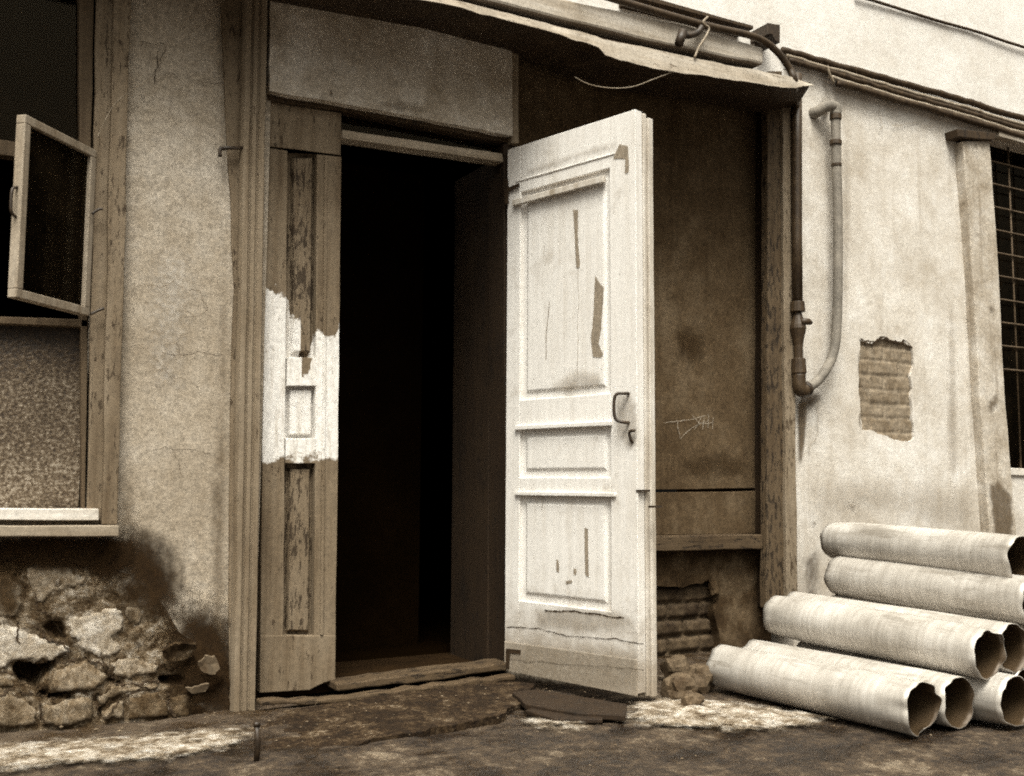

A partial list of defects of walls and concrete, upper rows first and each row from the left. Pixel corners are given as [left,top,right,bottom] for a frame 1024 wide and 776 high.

flaking render [858,336,912,441]
damp [0,531,230,714]
flaking render [0,564,230,732]
flaking render [656,581,719,657]